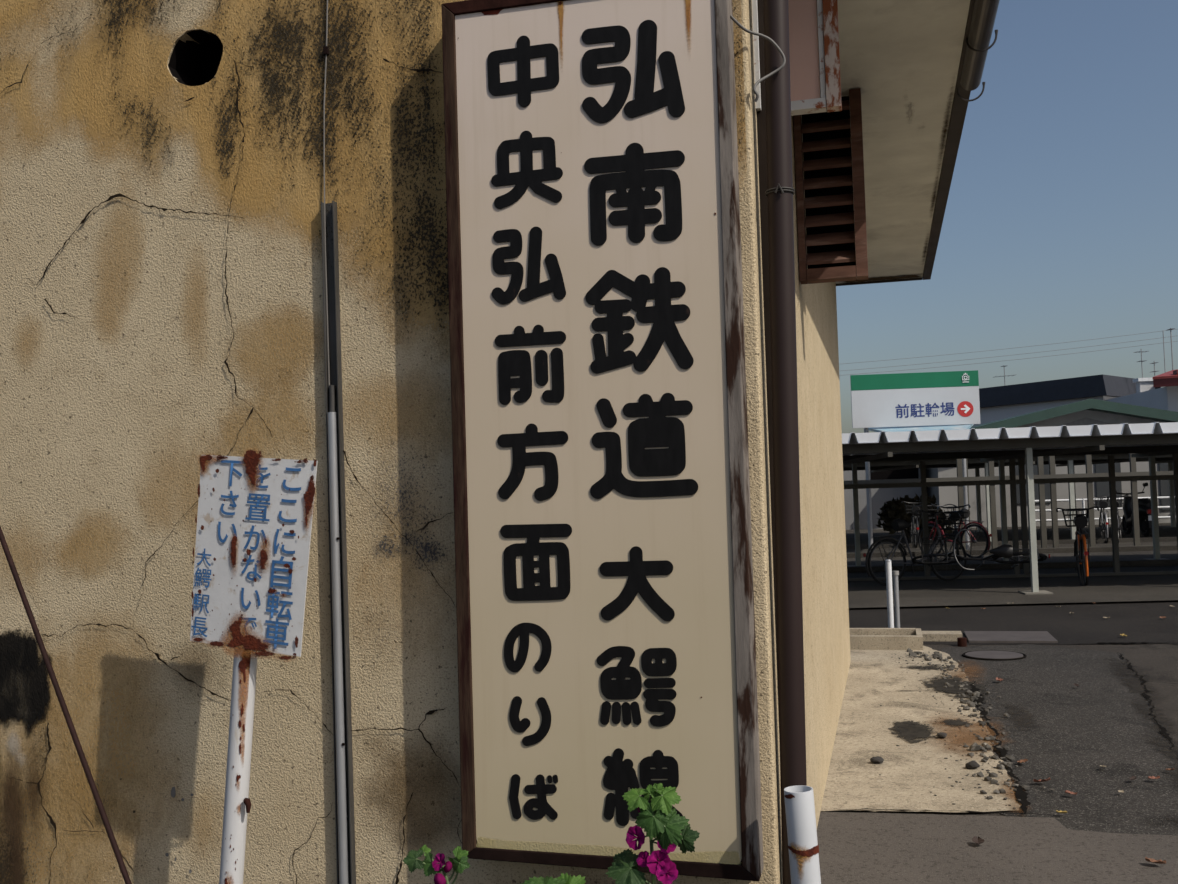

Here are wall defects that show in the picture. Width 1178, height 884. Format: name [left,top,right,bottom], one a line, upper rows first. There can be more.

crack [28,0,286,456]
leakage [0,0,465,339]
leakage [733,7,747,172]
crack [42,501,231,701]
crack [343,450,456,607]
crack [7,719,135,884]
leakage [0,629,147,884]
crack [292,803,333,884]
crack [264,689,461,788]
crack [366,790,414,884]